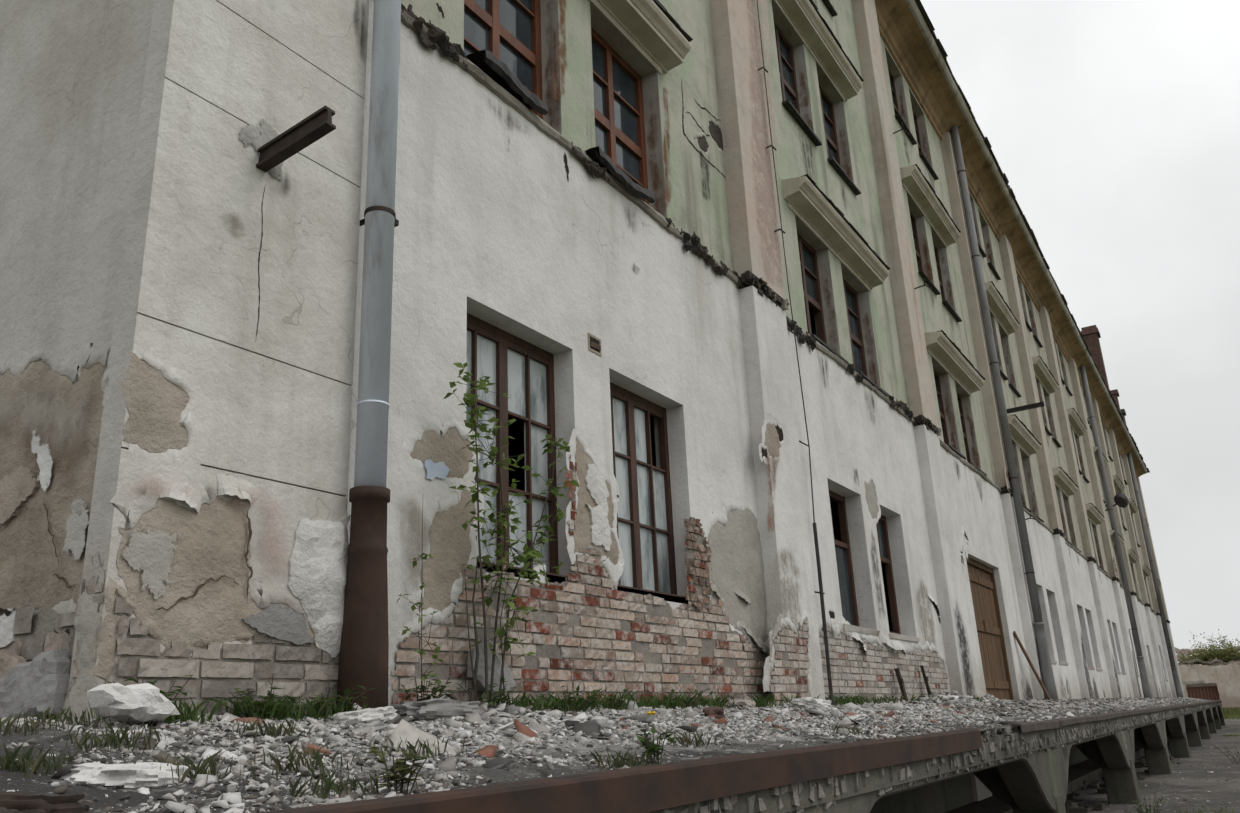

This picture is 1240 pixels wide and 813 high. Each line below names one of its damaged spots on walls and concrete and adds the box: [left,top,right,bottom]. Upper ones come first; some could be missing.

spalling [0,340,339,721]